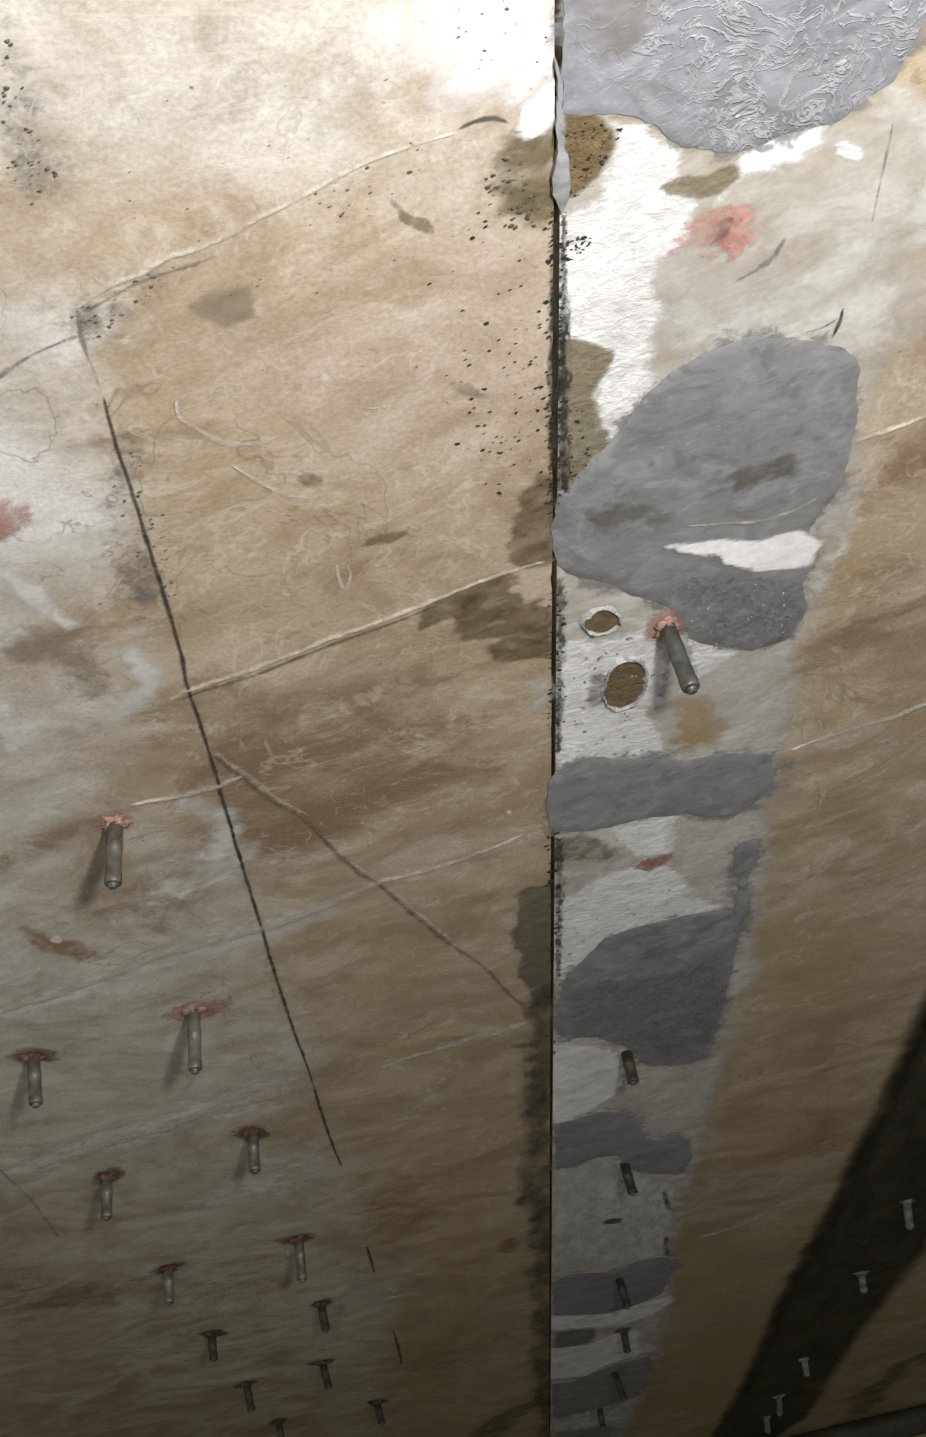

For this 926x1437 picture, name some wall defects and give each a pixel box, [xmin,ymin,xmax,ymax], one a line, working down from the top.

crack [0,304,99,379]
leakage [420,122,622,753]
crack [104,399,539,1166]
crack [393,1331,402,1365]
leakage [472,832,564,1437]
leakage [712,1014,926,1437]